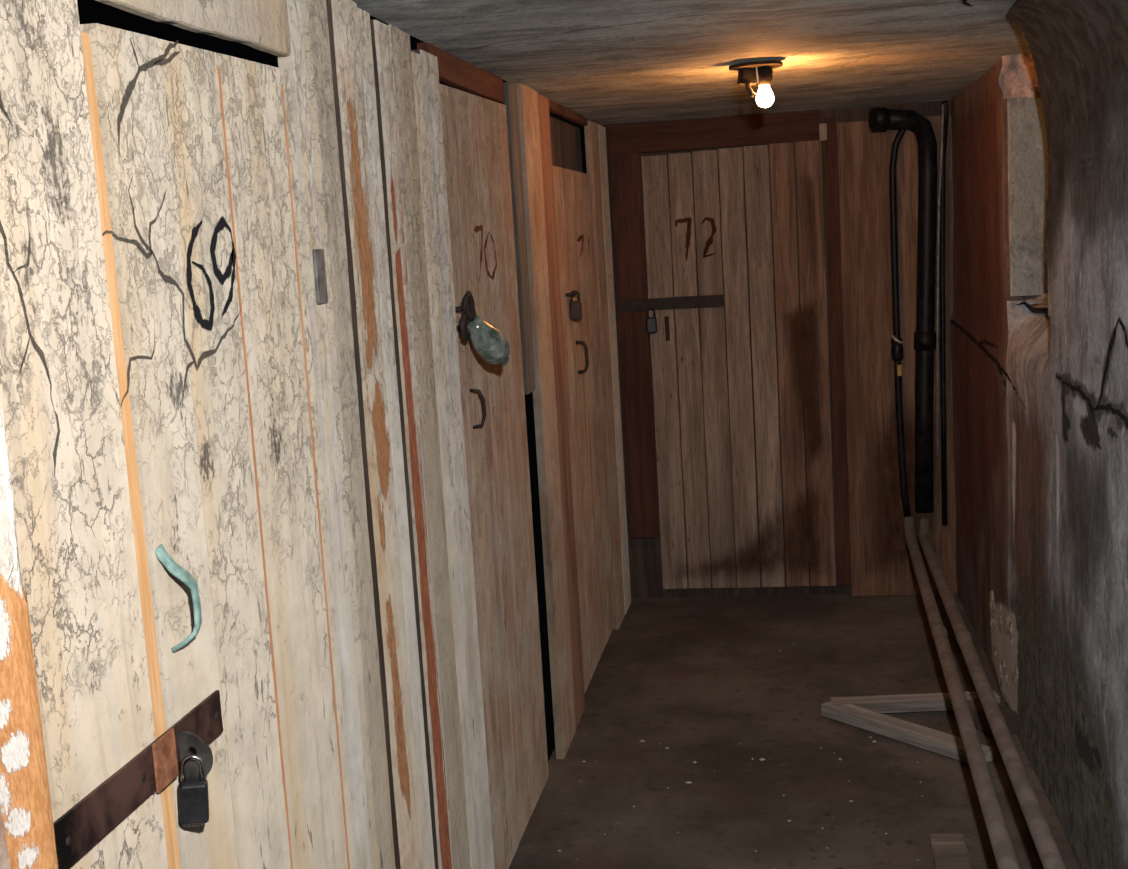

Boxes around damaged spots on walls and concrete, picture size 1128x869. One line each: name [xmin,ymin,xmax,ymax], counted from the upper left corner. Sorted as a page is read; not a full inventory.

crack [0,96,13,126]
crack [0,220,60,474]
crack [102,39,244,406]
crack [1055,316,1128,449]
peeling [0,573,59,869]